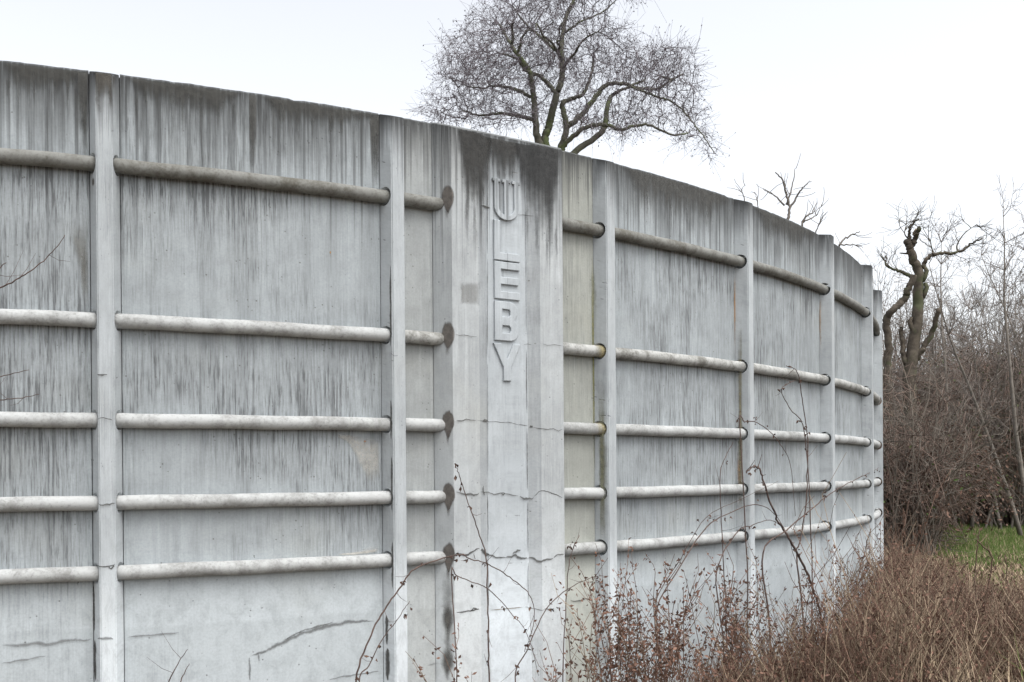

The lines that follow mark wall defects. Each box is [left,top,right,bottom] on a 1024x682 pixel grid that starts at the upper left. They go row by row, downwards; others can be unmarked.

water stain [133,78,236,108]
water stain [249,94,379,155]
water stain [459,129,559,221]
crack [456,178,490,345]
crack [458,407,562,508]
crack [6,564,175,680]
crack [249,617,390,680]
crack [457,548,588,613]